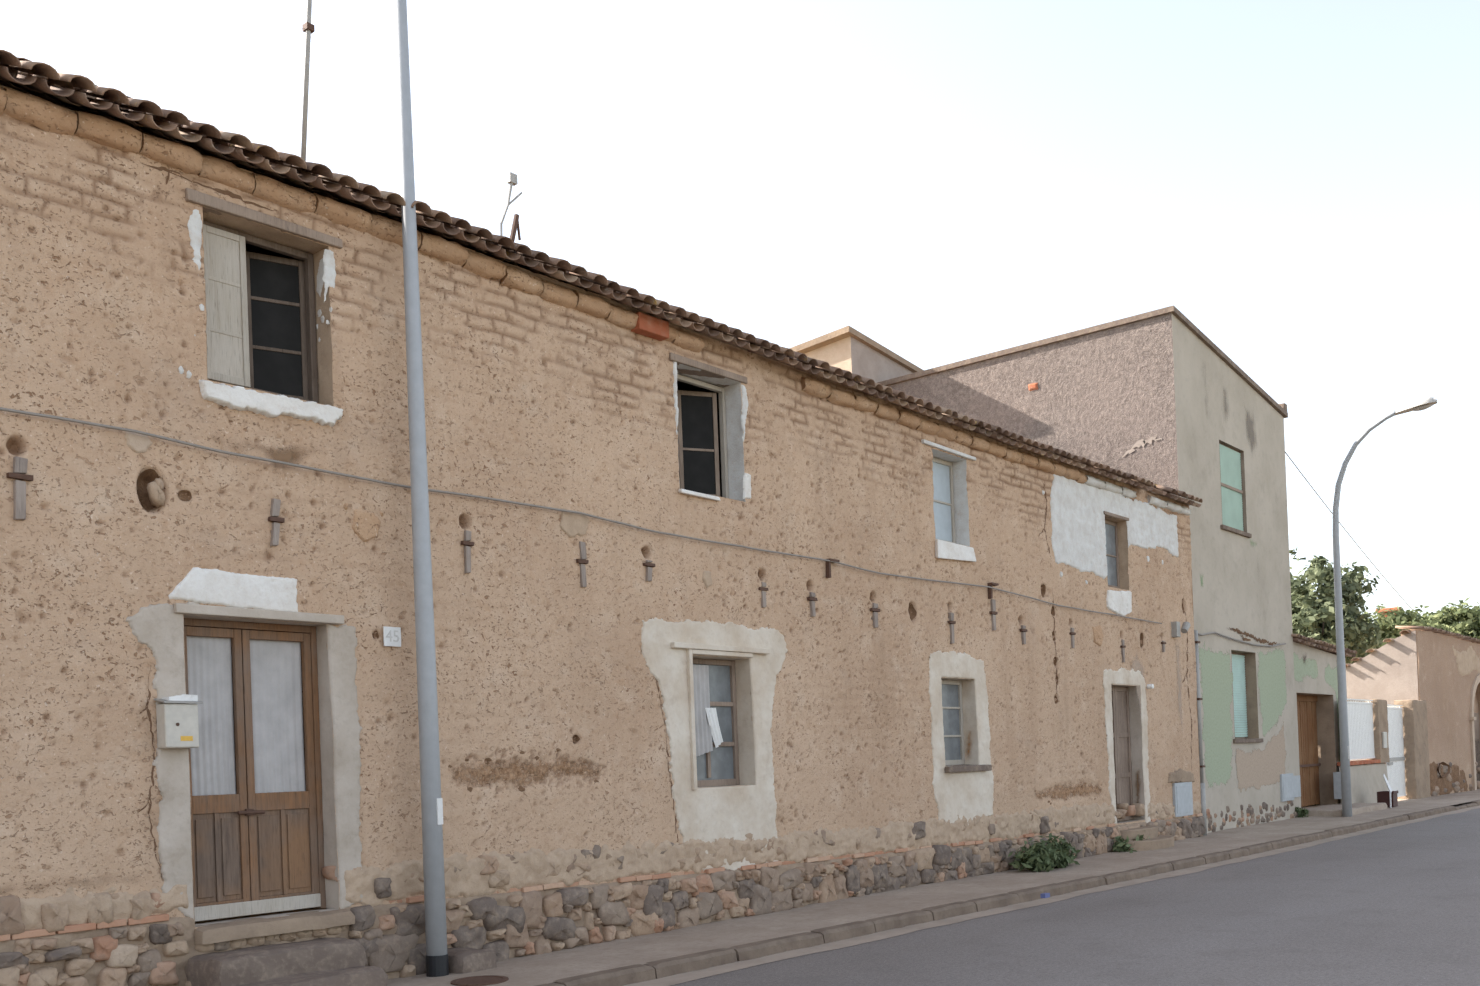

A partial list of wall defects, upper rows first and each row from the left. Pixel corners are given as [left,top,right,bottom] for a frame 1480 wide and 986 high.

peeling [1042,474,1179,584]
spalling [448,735,599,792]